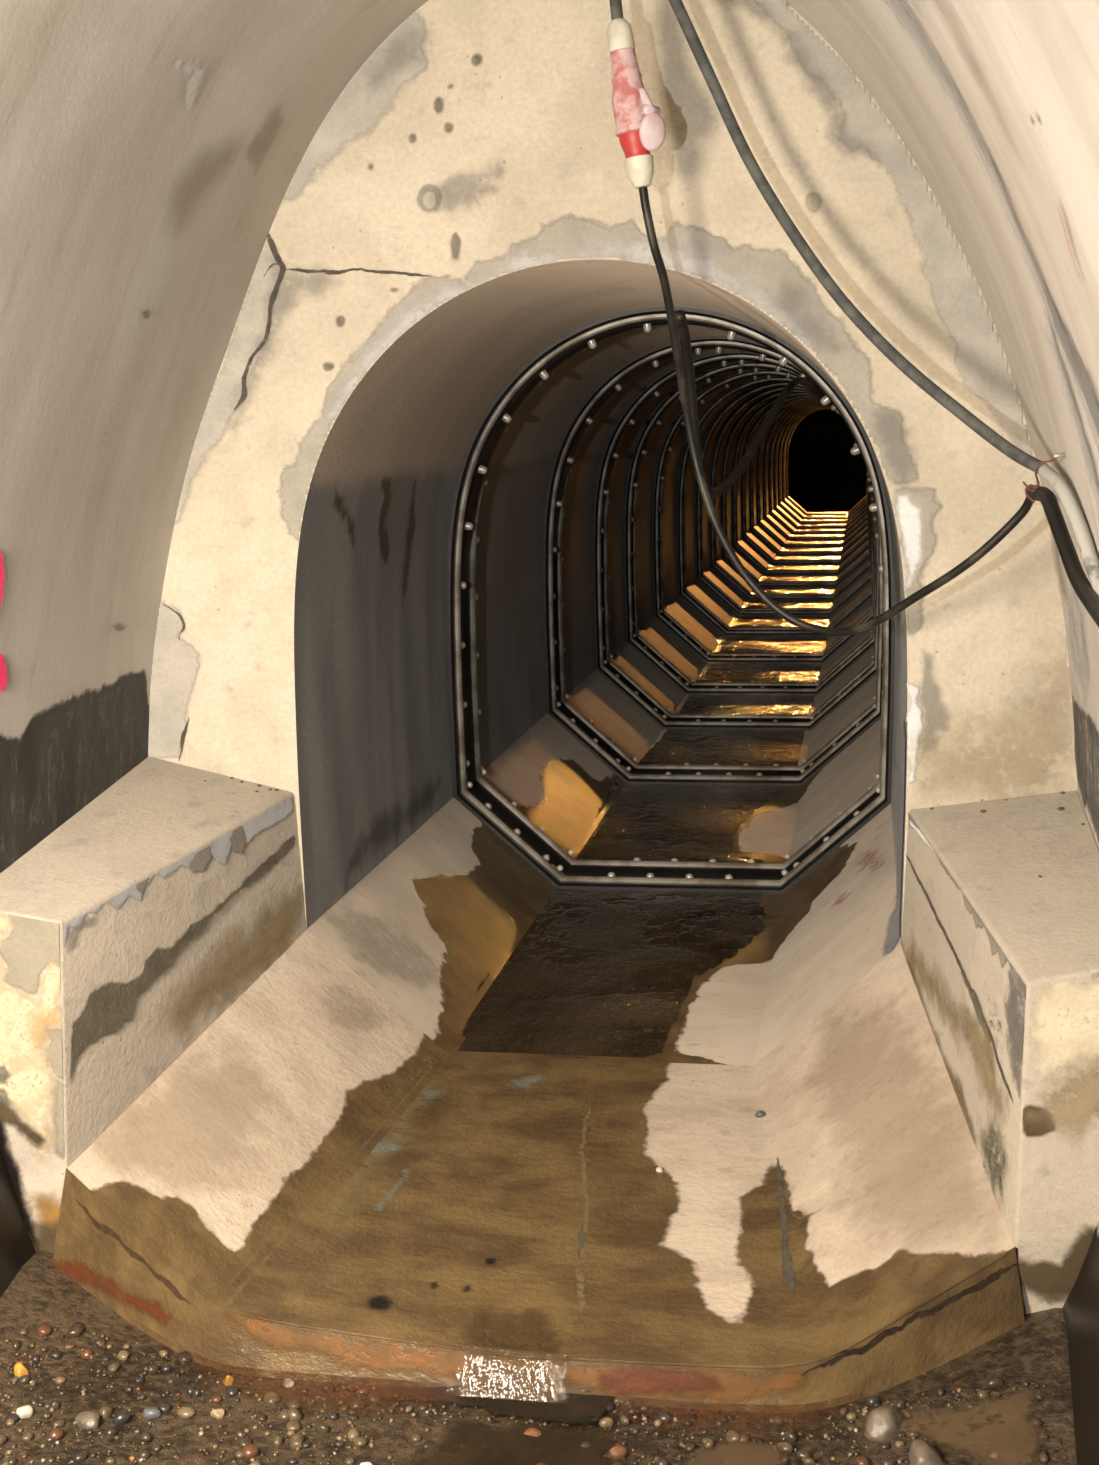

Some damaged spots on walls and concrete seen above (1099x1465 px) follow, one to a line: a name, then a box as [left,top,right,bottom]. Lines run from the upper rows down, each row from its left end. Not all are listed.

crack [234,233,429,410]
damp [884,0,1099,513]
damp [509,515,848,863]
spalling [0,913,61,1154]
rust [56,1261,171,1323]
crack [75,1199,189,1303]
damp [0,822,1099,1465]
crack [802,1264,1017,1376]
spalling [908,813,1099,1076]
spalling [1022,1105,1054,1136]